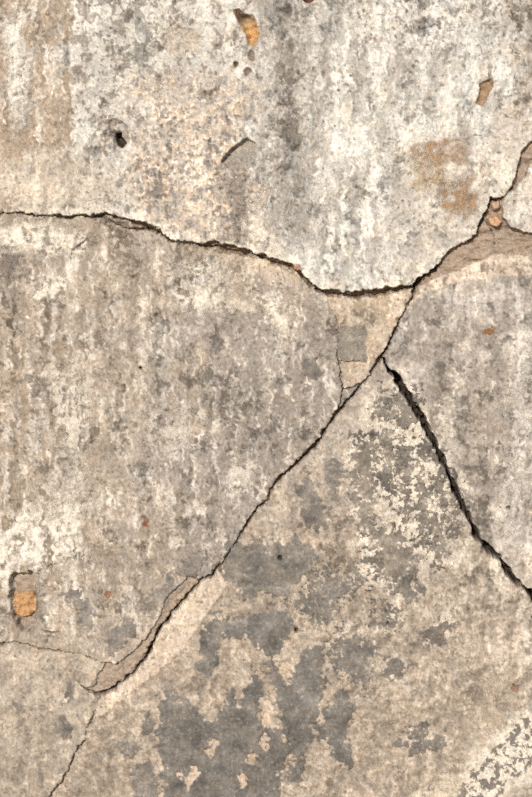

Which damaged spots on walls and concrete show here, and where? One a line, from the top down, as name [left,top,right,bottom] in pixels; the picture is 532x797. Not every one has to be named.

peeling [301,350,325,392]
crack [0,188,532,797]
flaking render [7,570,41,632]
peeling [62,589,97,630]
peeling [114,379,469,797]
peeling [106,616,137,657]
peeling [65,681,74,701]
peeling [55,715,73,740]